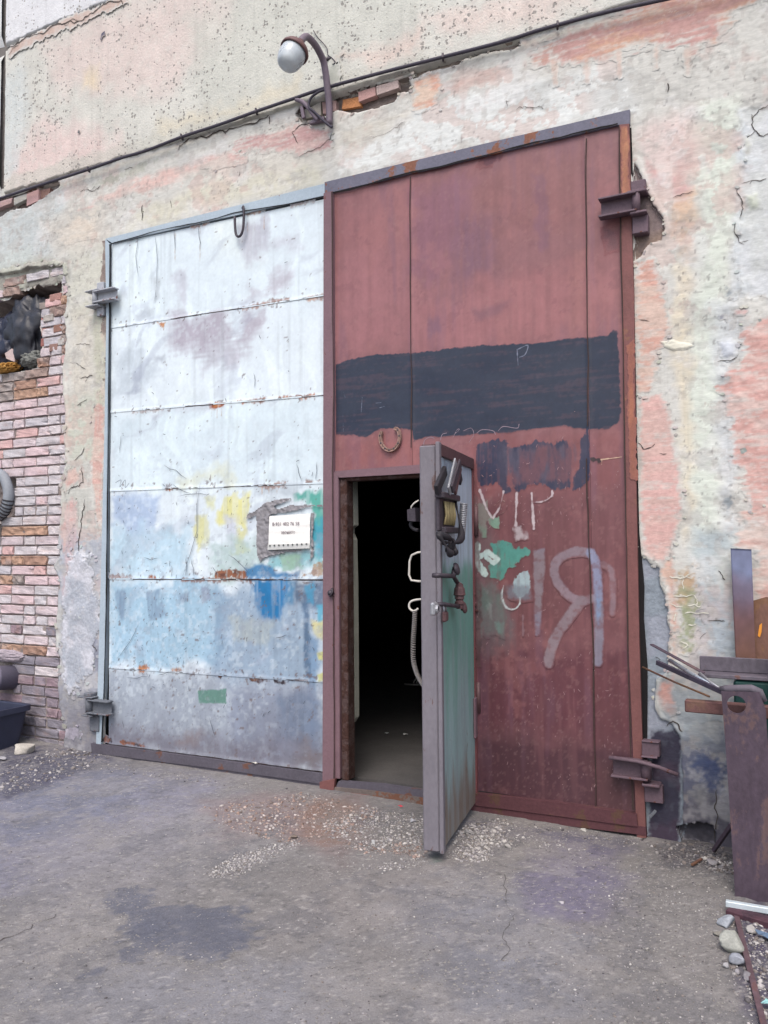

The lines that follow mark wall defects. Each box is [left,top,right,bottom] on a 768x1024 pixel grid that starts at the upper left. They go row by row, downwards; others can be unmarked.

peeling [229,42,521,157]
crack [747,105,768,138]
corrosion [620,126,631,193]
crack [734,178,766,244]
peeling [713,105,768,600]
corrosion [131,406,164,415]
corrosion [207,391,316,418]
corrosion [626,339,638,481]
peeling [633,163,695,739]
flaking render [0,258,105,746]
corrosion [179,567,252,585]
flaking render [676,794,717,842]